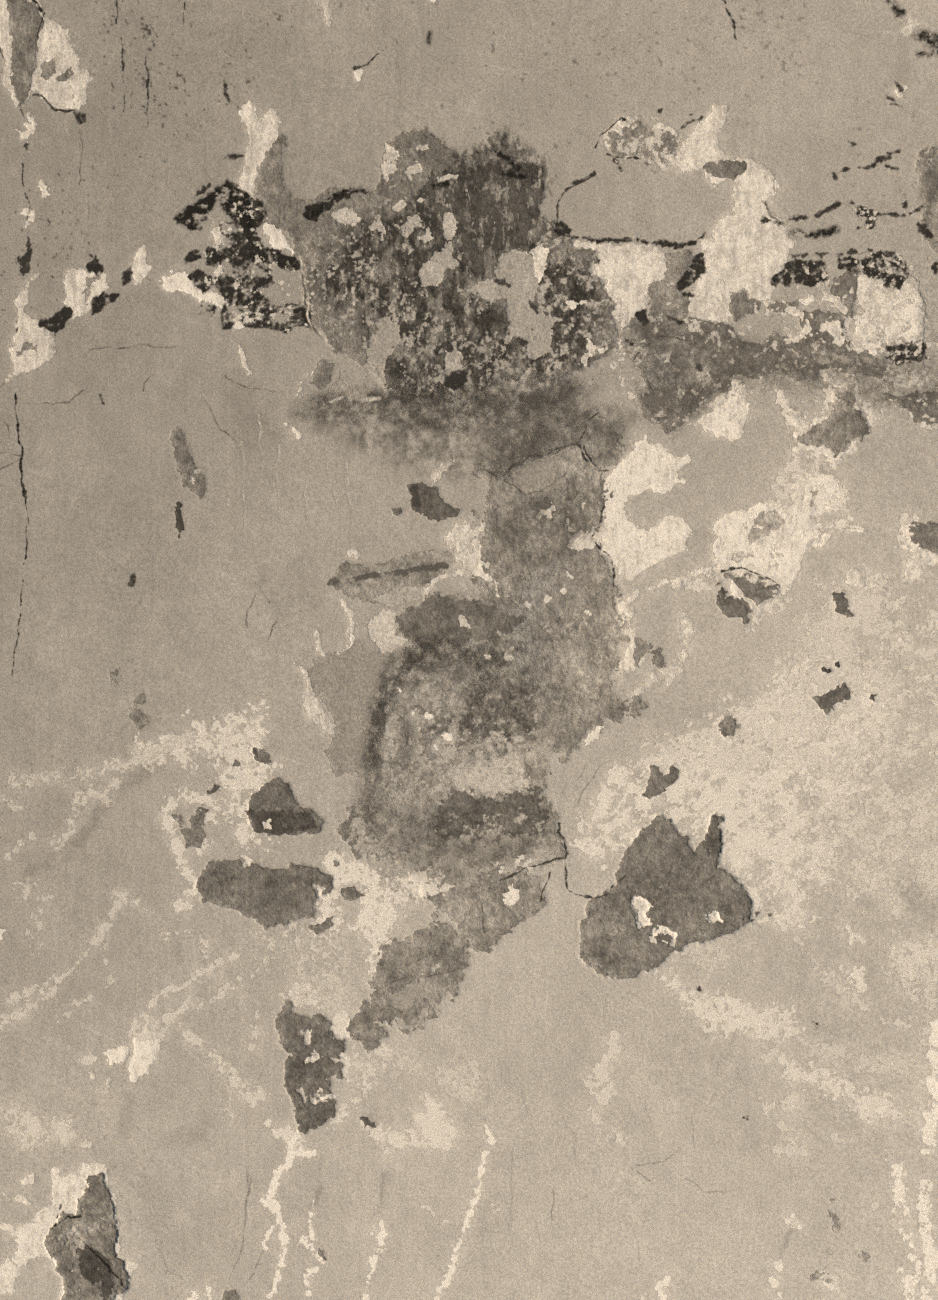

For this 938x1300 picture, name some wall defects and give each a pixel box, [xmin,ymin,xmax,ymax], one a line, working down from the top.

peeling [0,0,93,143]
peeling [4,273,56,383]
peeling [62,268,109,320]
peeling [158,242,297,335]
spalling [231,101,938,634]
crack [1,393,29,675]
water stain [328,561,449,585]
spalling [0,408,938,1161]
water stain [918,1019,938,1155]
water stain [259,1133,325,1299]
water stain [420,1125,514,1300]
water stain [870,1159,938,1300]